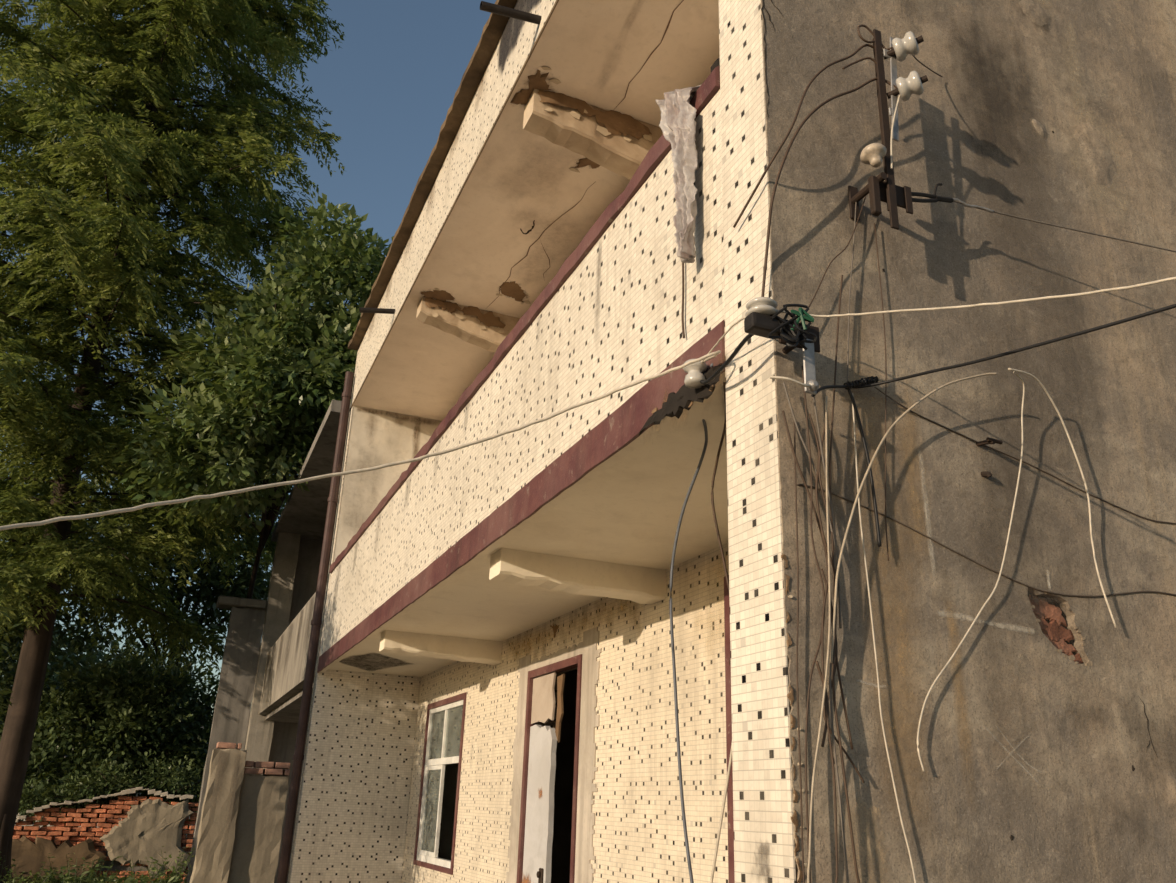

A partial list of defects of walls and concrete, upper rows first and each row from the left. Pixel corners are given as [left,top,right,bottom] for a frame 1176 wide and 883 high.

crack [616,0,684,107]
spalling [510,66,652,142]
crack [490,181,596,305]
spalling [421,288,506,333]
spalling [496,281,531,304]
spalling [1028,586,1093,666]